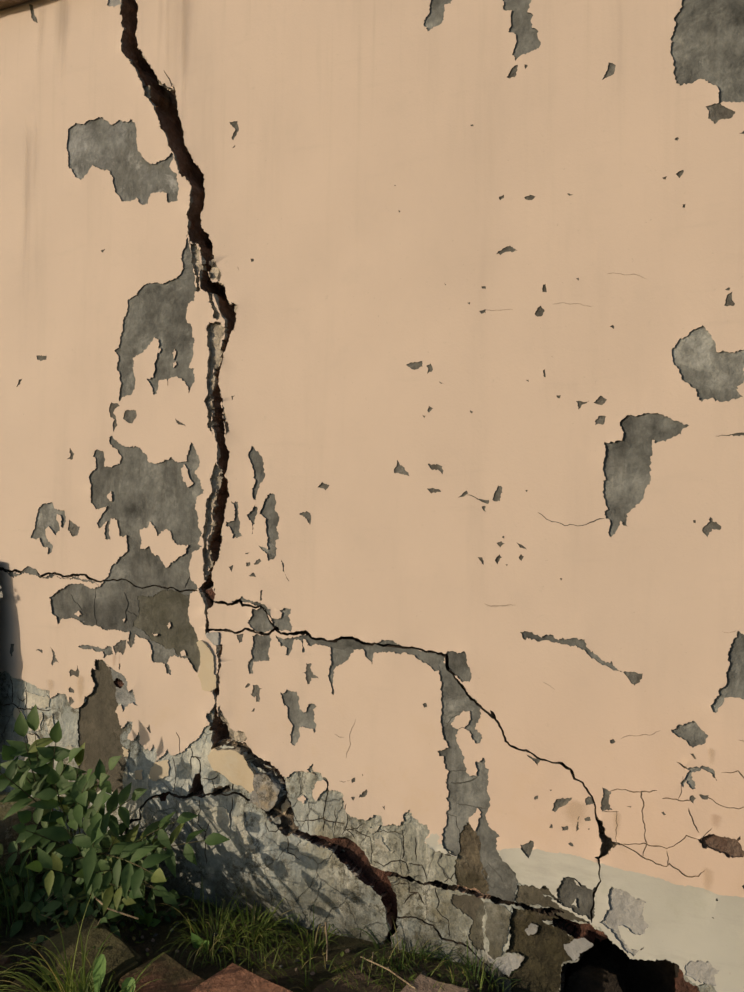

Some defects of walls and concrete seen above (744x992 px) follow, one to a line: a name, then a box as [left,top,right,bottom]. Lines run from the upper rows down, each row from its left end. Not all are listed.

peeling [670,0,744,124]
peeling [66,117,179,205]
peeling [672,325,744,402]
crack [0,565,29,573]
peeling [6,231,222,711]
crack [36,570,198,592]
peeling [226,446,289,581]
crack [120,0,704,992]
peeling [602,413,689,537]
crack [3,680,50,744]
peeling [710,631,744,713]
peeling [231,590,593,992]